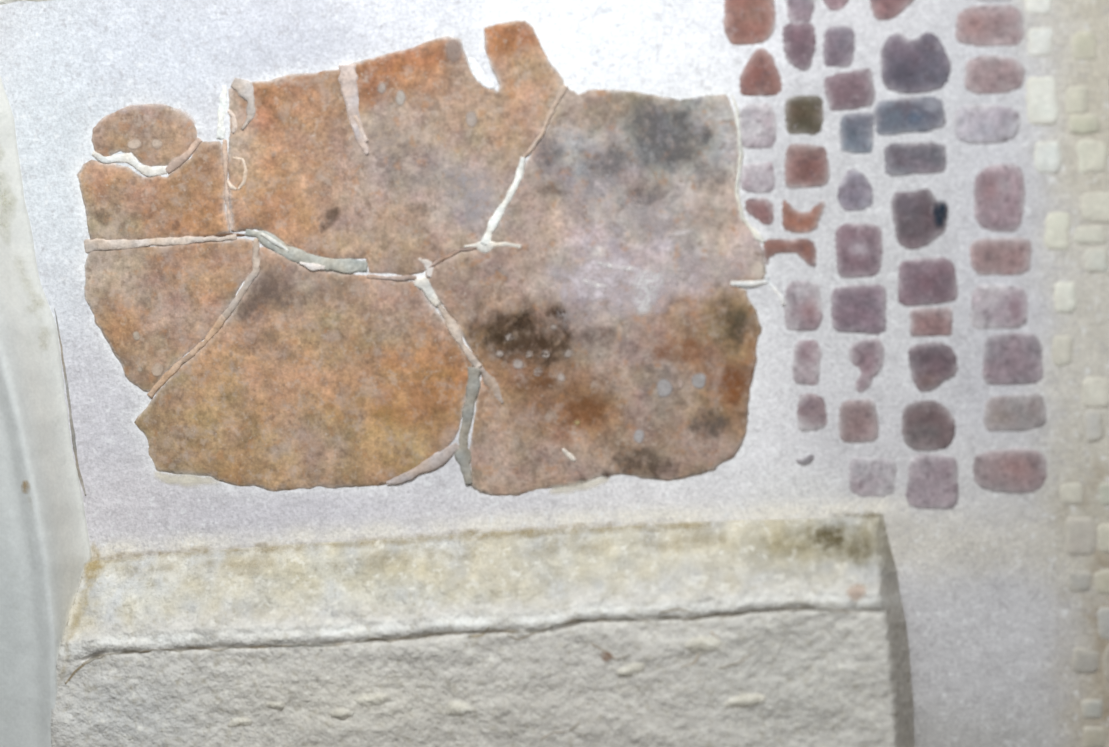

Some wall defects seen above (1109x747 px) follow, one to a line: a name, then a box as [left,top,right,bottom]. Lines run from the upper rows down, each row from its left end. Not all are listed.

crack [65,608,861,684]